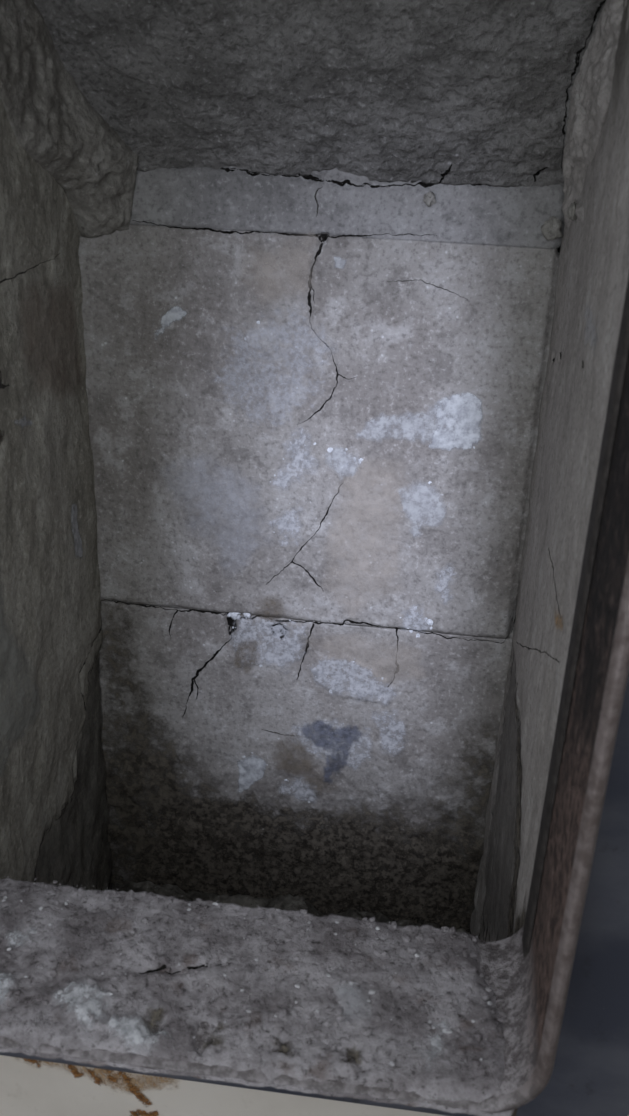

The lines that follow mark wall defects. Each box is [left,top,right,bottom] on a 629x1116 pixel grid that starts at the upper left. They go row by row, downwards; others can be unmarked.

crack [0,253,60,283]
crack [133,0,606,424]
crack [266,479,345,592]
crack [104,599,559,720]
water stain [303,721,358,781]
rust [24,1058,174,1116]